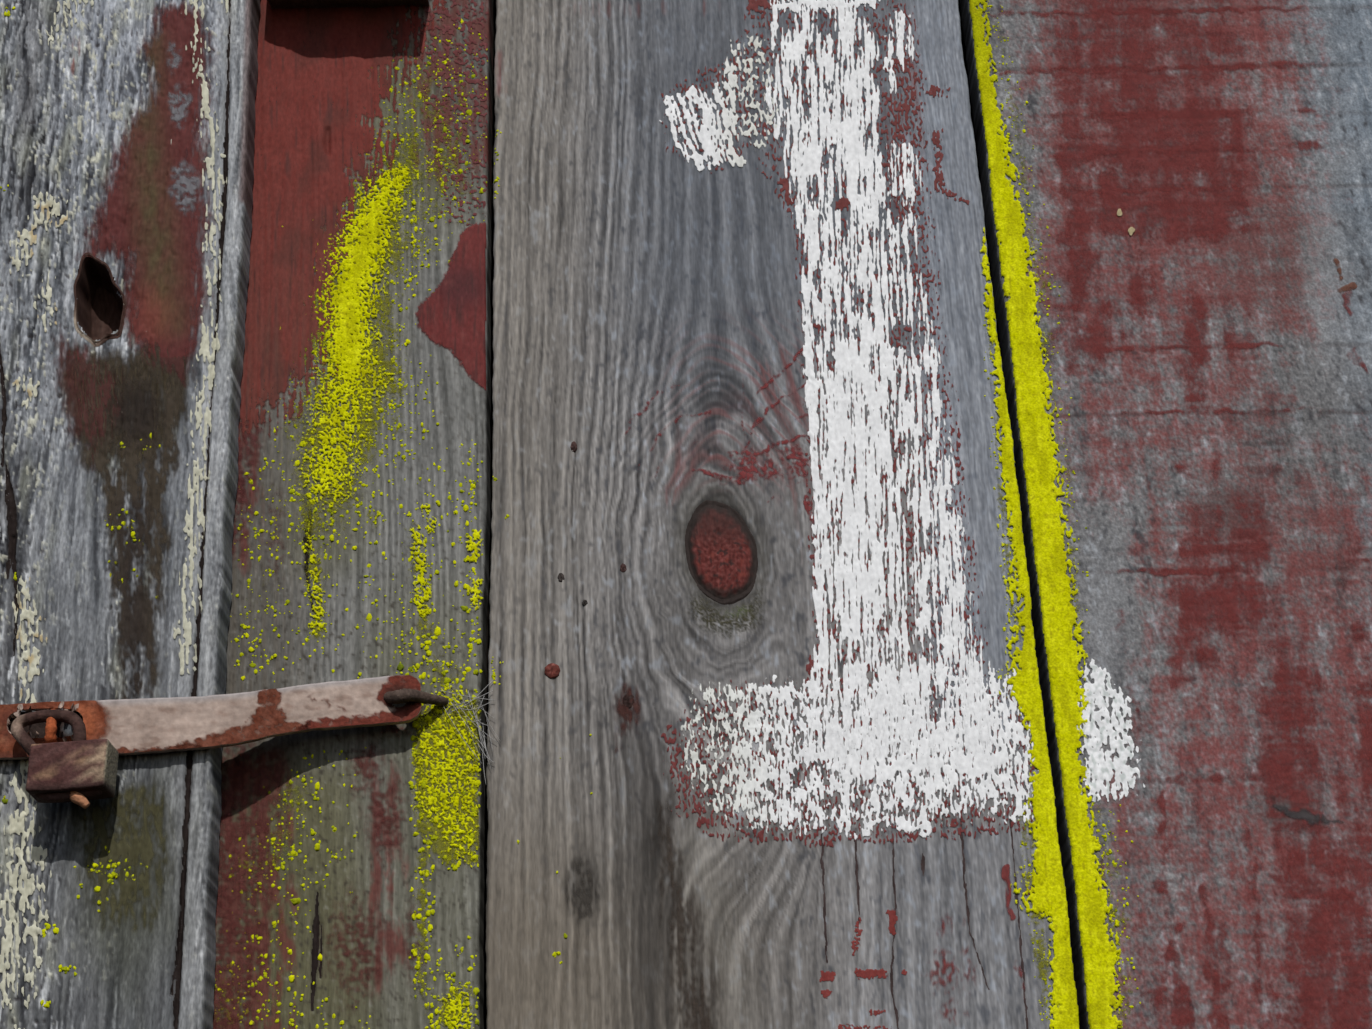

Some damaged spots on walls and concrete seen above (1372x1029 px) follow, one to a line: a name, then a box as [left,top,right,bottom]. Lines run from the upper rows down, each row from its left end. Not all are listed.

peeling [1009,0,1303,314]
peeling [1298,141,1319,150]
peeling [12,367,41,409]
peeling [59,344,121,459]
peeling [83,0,228,675]
peeling [661,0,1035,848]
peeling [1052,297,1245,414]
peeling [1225,334,1275,356]
crack [0,352,19,656]
corrosion [0,700,108,758]
corrosion [116,675,421,753]
peeling [1124,498,1372,1029]